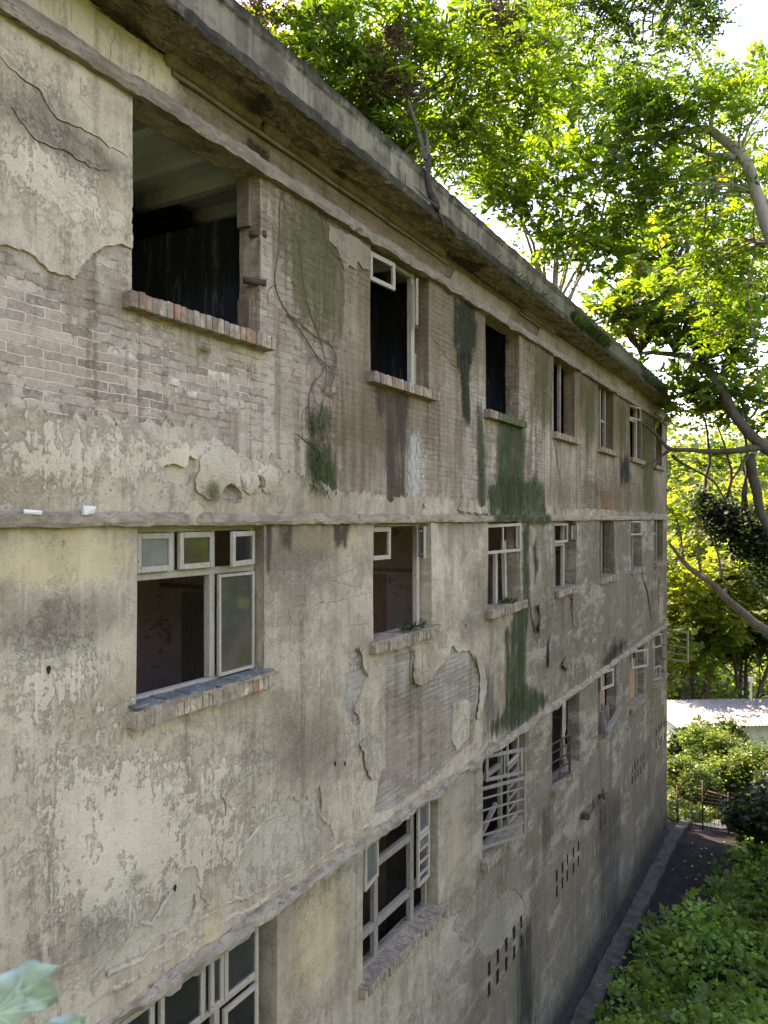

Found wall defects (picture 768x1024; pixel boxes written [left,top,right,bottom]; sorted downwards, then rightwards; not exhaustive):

crack [0,55,129,171]
peeling [0,244,290,455]
peeling [82,505,96,515]
spalling [163,455,197,487]
spalling [222,484,243,504]
water stain [376,387,420,502]
peeling [360,642,487,814]
water stain [485,668,497,730]